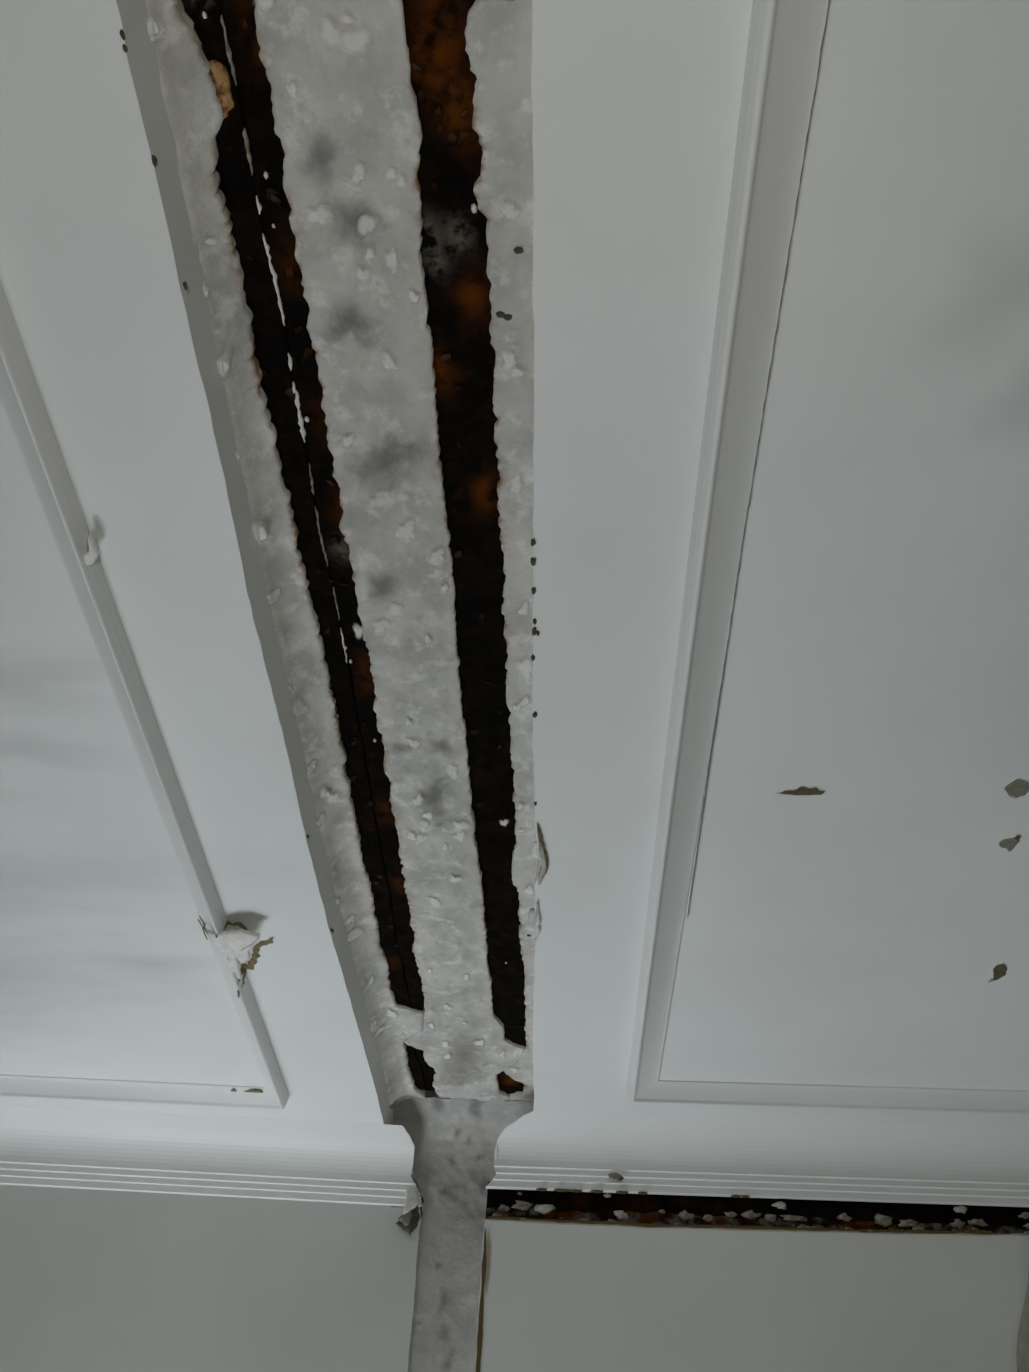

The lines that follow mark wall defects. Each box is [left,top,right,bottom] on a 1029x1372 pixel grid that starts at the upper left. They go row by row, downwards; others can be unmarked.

corrosion [210,60,235,118]
flaking render [144,0,549,1372]
peeling [776,785,826,796]
peeling [1003,778,1029,799]
peeling [997,834,1022,852]
peeling [986,962,1008,983]